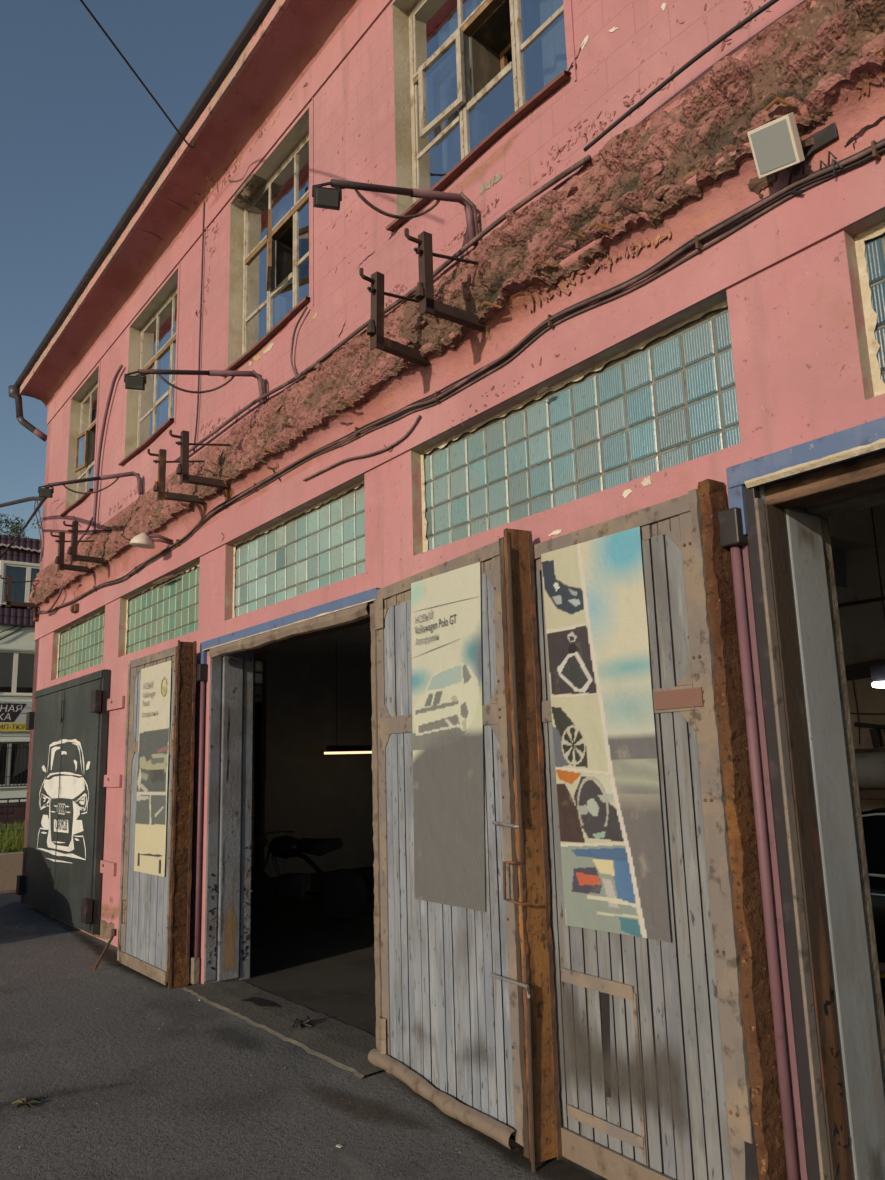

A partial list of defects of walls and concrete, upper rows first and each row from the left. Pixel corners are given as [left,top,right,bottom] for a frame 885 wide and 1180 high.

spalling [28,0,885,609]
rust [168,642,194,990]
rust [504,528,557,1163]
rust [697,479,788,1180]